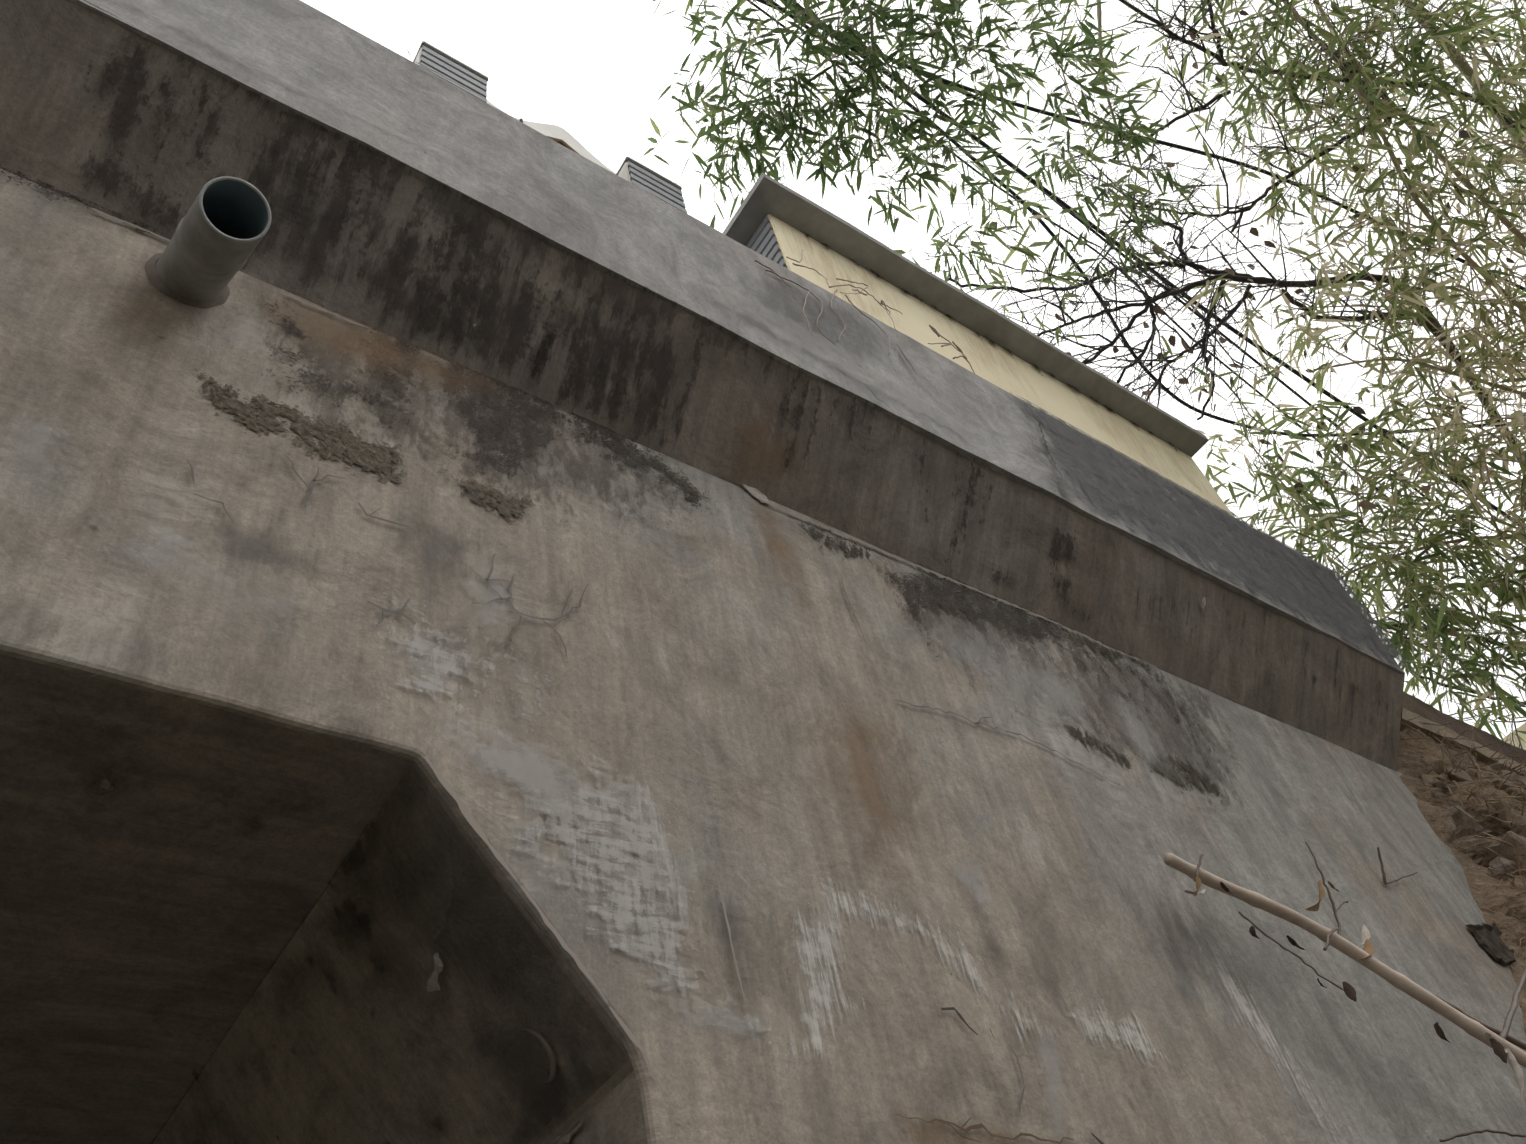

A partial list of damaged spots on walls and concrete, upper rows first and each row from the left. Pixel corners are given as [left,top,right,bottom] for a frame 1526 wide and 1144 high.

damp [0,37,747,512]
damp [764,356,876,468]
damp [1031,362,1153,435]
crack [469,553,589,660]
damp [798,452,1236,805]
crack [897,1007,1104,1144]